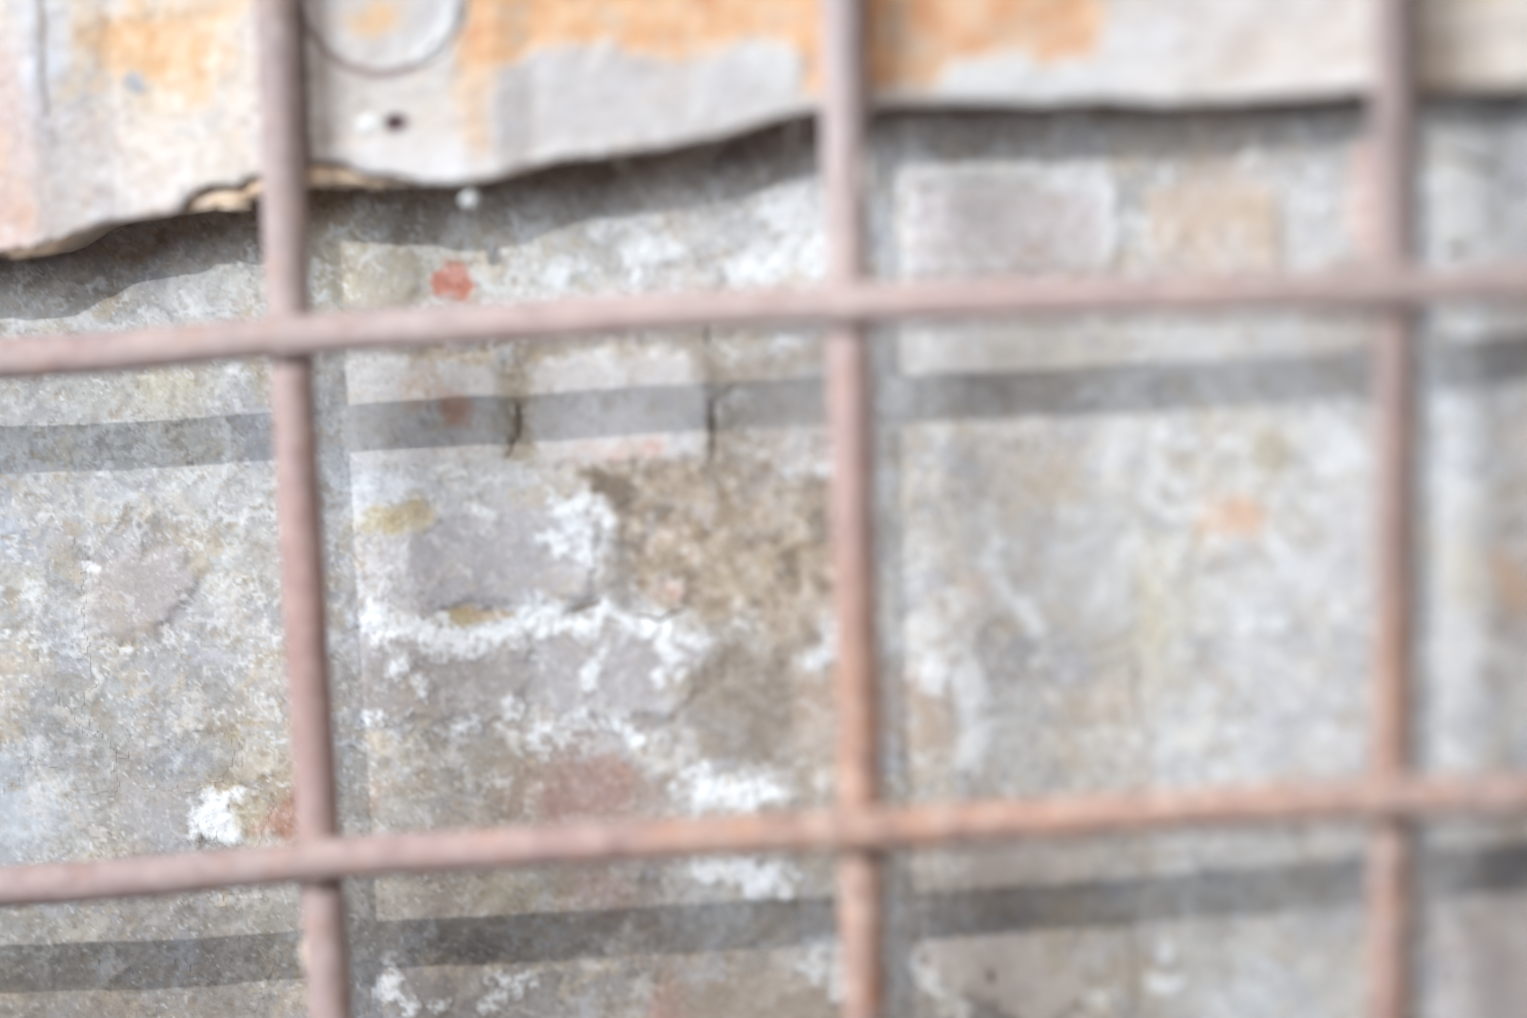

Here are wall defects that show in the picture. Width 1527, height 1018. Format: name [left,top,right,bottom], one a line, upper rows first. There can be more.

crack [37,0,48,117]
crack [180,174,261,211]
peeling [182,174,262,212]
crack [308,161,418,183]
peeling [304,163,423,189]
crack [506,404,522,458]
crack [708,404,716,458]
crack [570,601,601,611]
leakage [344,410,836,818]
crack [635,609,684,622]
leakage [684,856,805,910]